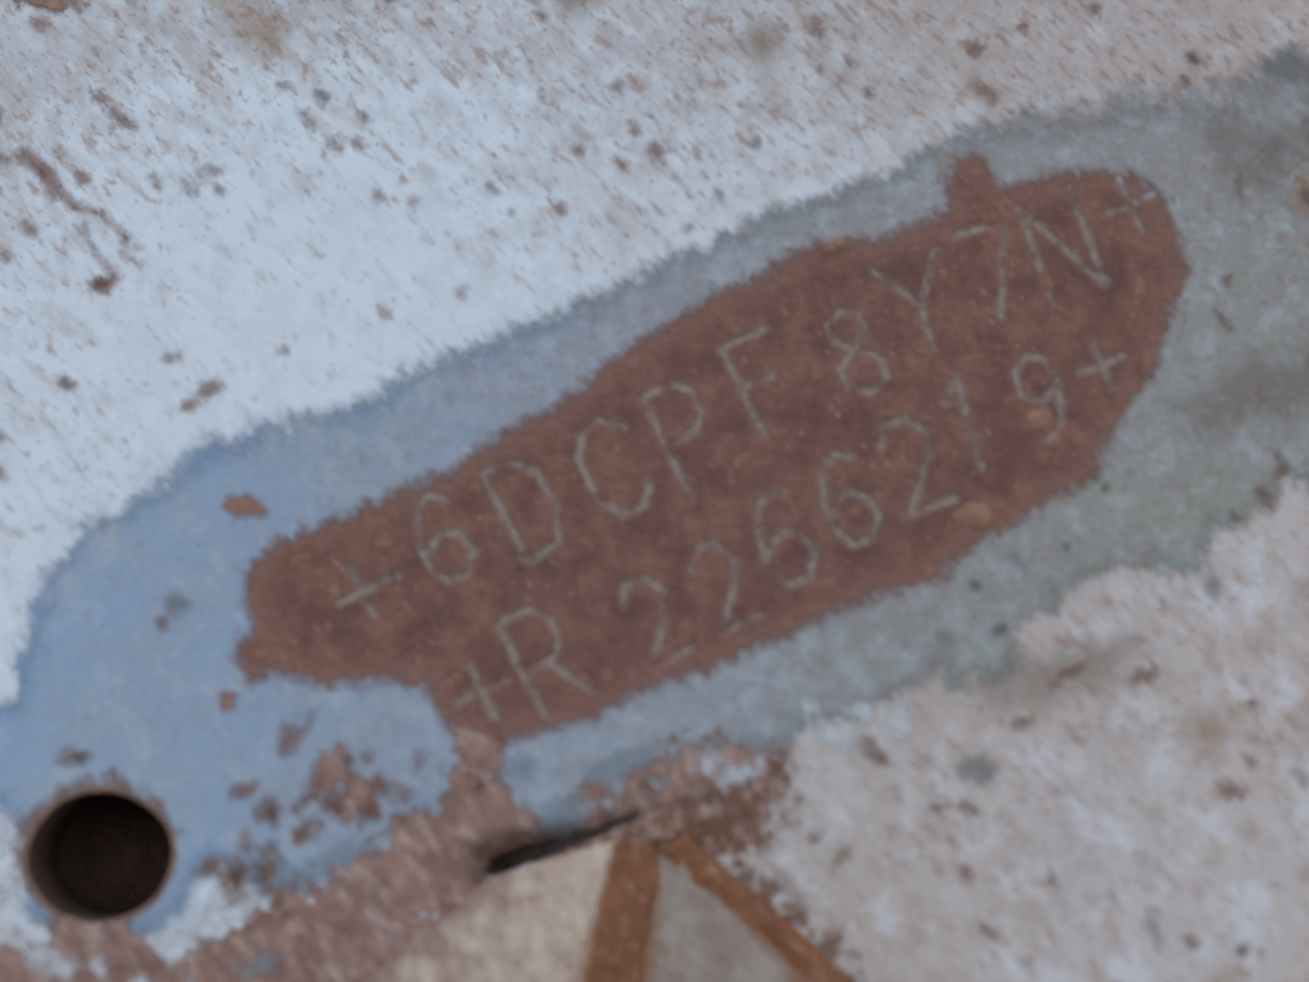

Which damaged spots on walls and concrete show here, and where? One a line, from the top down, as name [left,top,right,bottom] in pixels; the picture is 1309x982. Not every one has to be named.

peeling [224,495,266,515]
corrosion [0,153,1189,982]
peeling [589,749,650,781]
peeling [717,757,765,786]
peeling [546,798,577,832]
peeling [209,887,259,925]
peeling [24,942,105,980]